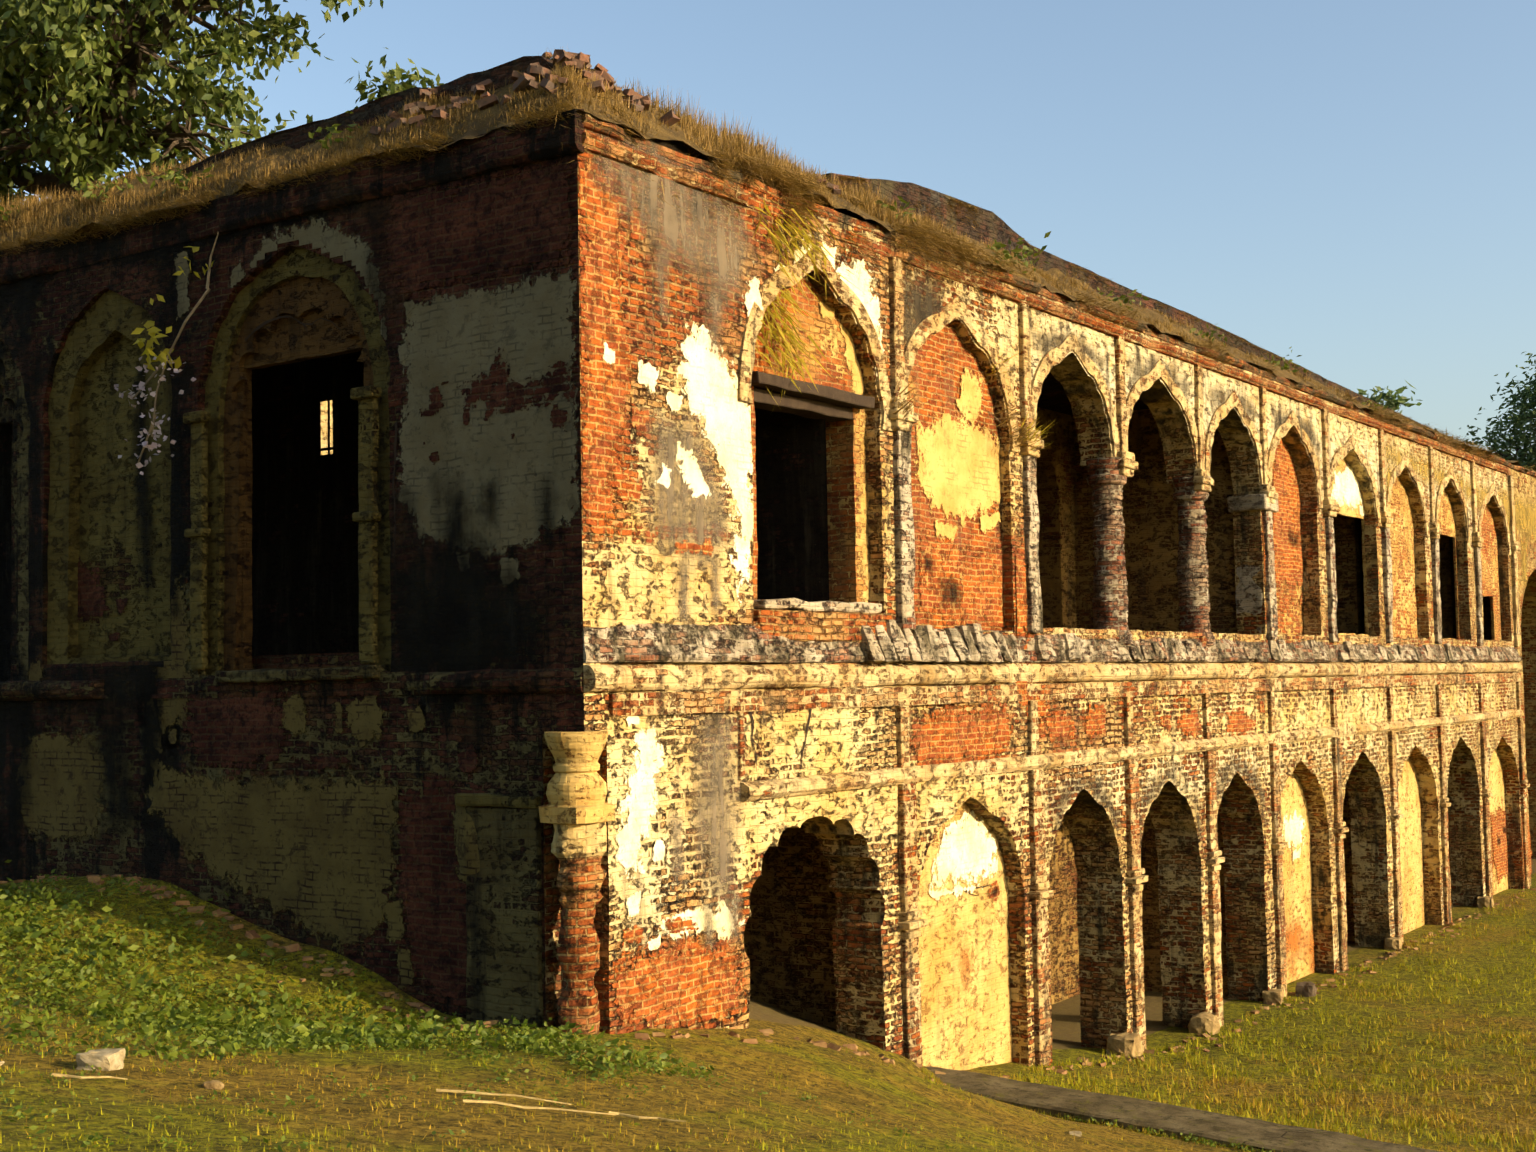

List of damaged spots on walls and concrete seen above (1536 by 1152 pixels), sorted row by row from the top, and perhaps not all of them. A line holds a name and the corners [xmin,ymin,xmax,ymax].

peeling [174,251,190,322]
peeling [228,155,754,603]
water stain [170,421,191,571]
peeling [914,367,1037,650]
peeling [406,704,426,733]
peeling [1161,706,1202,739]
peeling [1221,701,1265,736]
peeling [144,694,414,990]
peeling [603,916,747,1031]